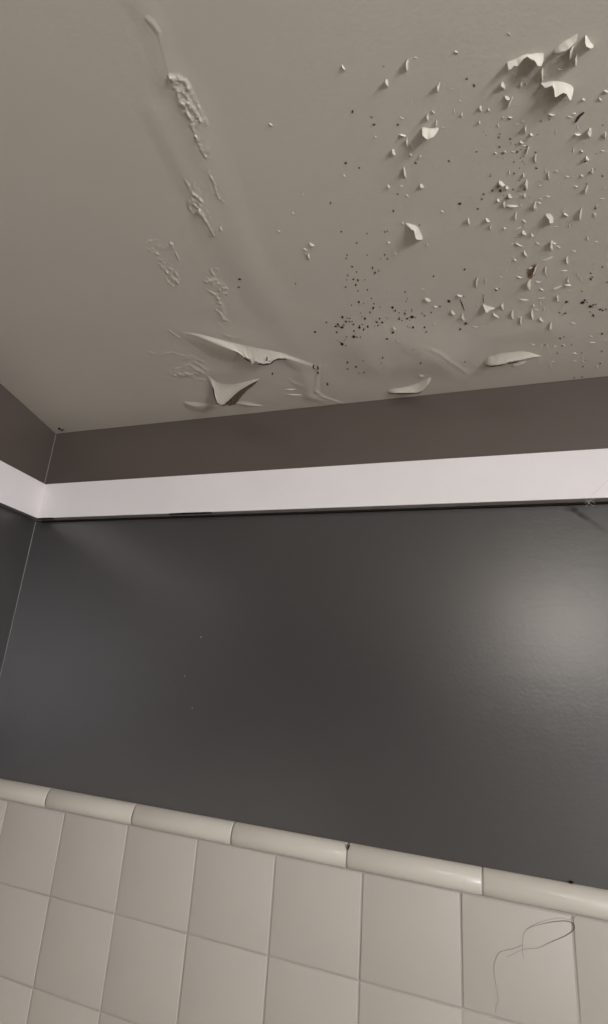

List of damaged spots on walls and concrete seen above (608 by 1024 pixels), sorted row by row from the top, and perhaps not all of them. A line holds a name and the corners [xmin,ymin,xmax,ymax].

peeling [421,34,605,331]
peeling [402,222,428,246]
leakage [326,254,450,347]
peeling [183,332,317,373]
peeling [484,344,584,367]
peeling [183,375,262,412]
peeling [388,375,431,394]